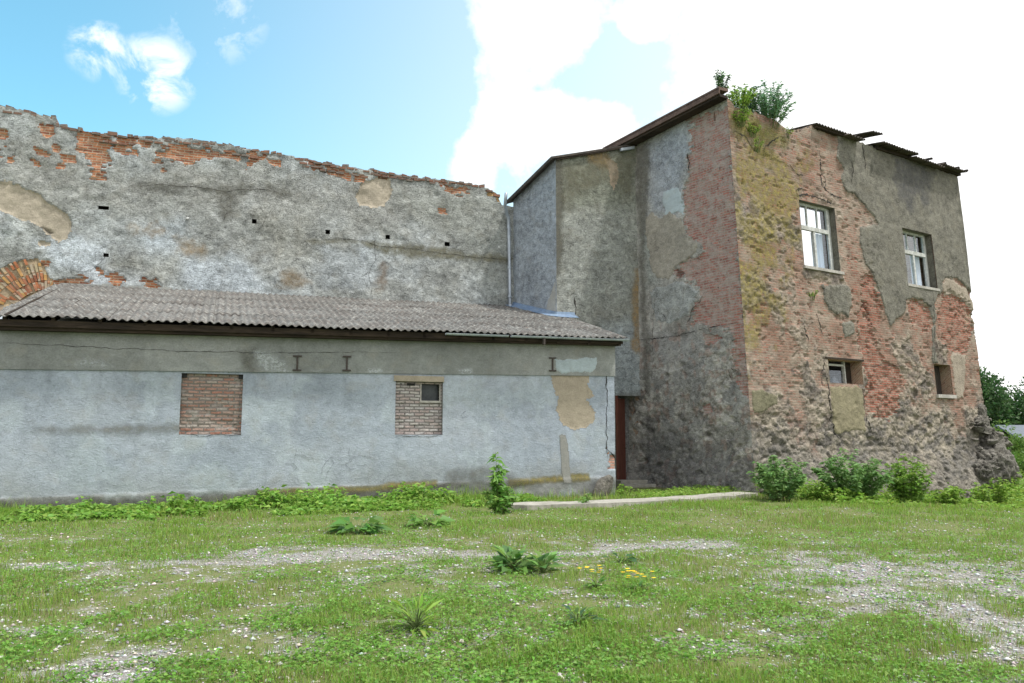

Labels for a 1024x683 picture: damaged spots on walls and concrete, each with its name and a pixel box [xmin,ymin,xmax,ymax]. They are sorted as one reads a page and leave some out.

flaking render [0,128,15,163]
flaking render [0,179,72,247]
flaking render [30,122,281,180]
flaking render [308,160,393,208]
flaking render [438,179,471,197]
crack [735,131,866,198]
flaking render [672,106,778,413]
flaking render [821,136,974,423]
peeling [551,375,596,430]
crack [821,362,840,439]